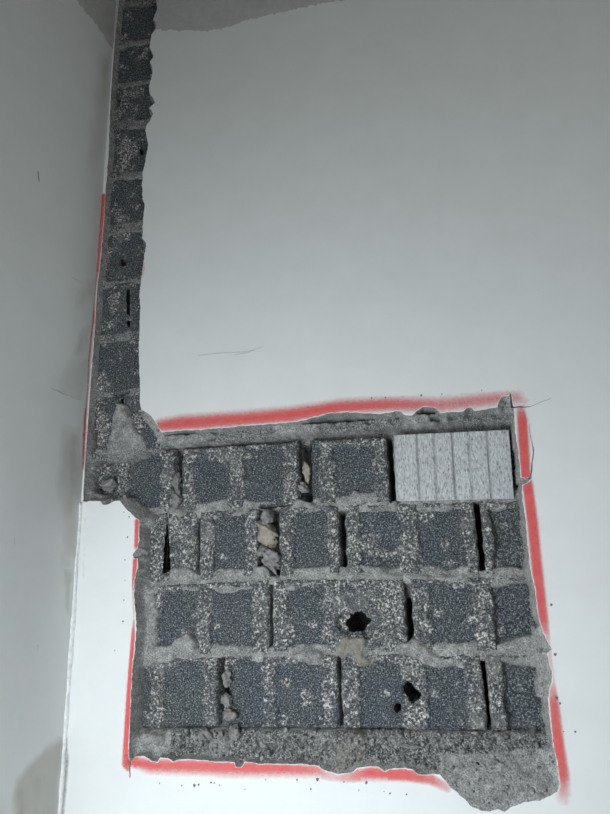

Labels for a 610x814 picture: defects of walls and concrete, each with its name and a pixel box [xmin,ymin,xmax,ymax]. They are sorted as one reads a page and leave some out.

flaking render [83,0,560,812]